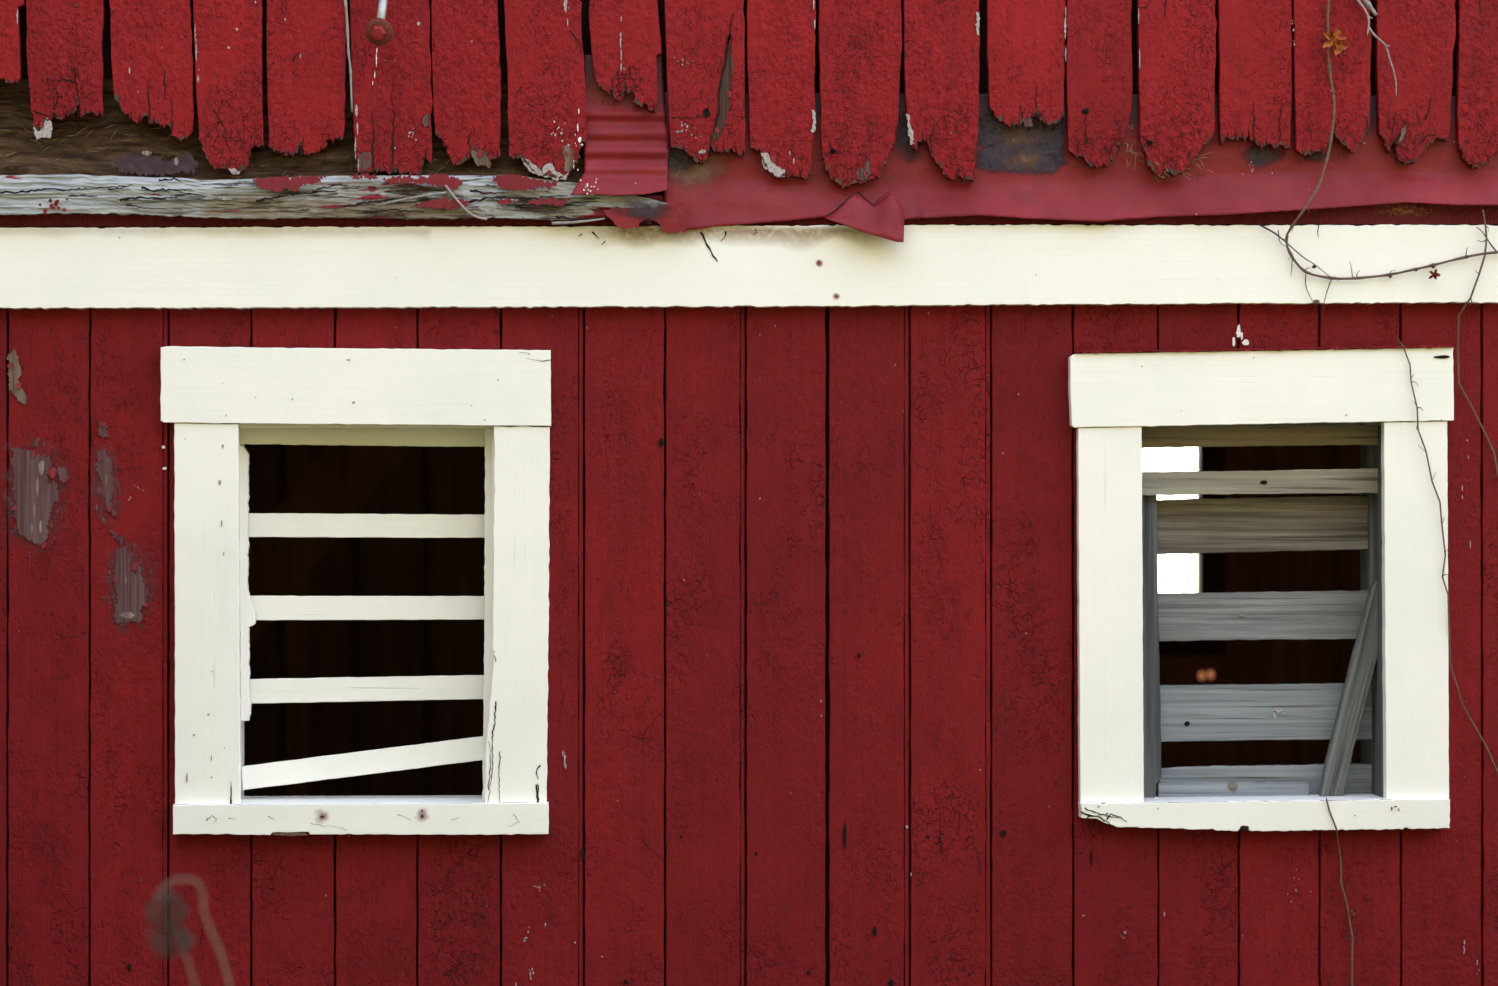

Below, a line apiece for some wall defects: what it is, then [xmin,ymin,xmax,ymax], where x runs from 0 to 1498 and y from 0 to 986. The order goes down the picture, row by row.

peeling [7,350,28,405]
peeling [5,437,70,548]
peeling [91,421,152,628]